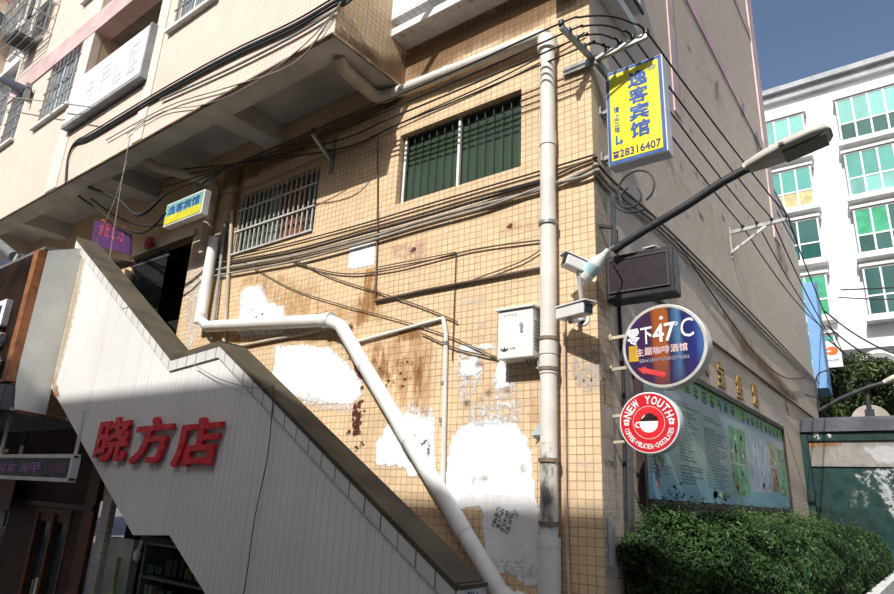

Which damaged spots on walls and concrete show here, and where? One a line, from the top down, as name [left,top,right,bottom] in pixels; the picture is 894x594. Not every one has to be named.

rust [357,270,380,325]
rust [398,328,419,341]
rust [371,348,422,402]
peeling [856,467,894,517]